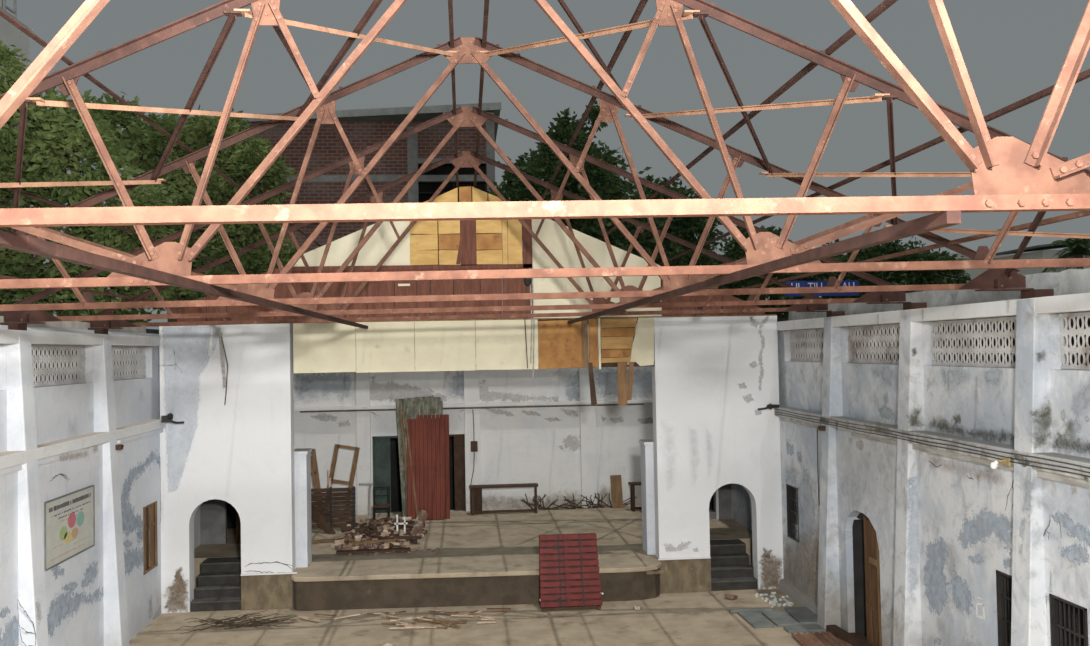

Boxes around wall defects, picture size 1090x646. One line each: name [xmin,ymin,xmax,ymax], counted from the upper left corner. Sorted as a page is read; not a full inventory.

peeling [0,608,19,646]
peeling [36,563,103,636]
peeling [121,451,160,575]
crack [245,561,294,573]
peeling [923,510,1013,615]
peeling [1051,511,1090,564]